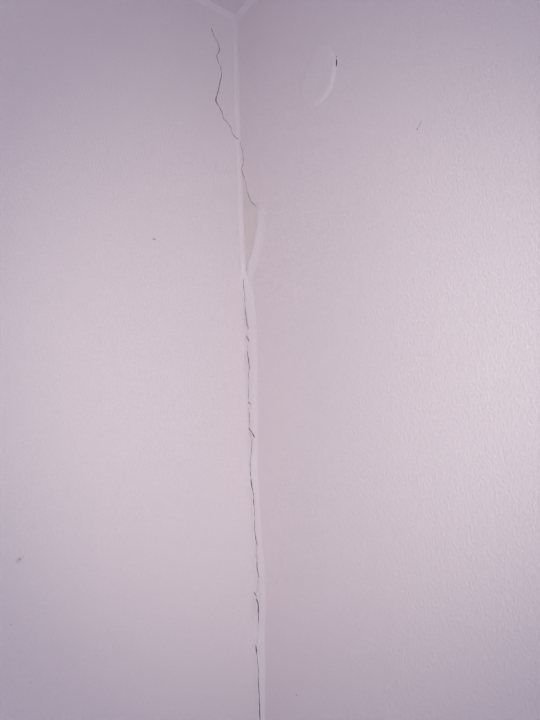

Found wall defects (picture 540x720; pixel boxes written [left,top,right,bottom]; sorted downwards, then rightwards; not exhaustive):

crack [211,28,256,207]
crack [242,279,261,720]